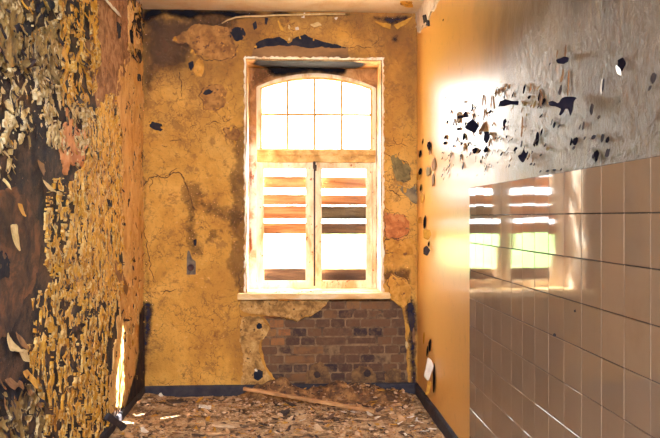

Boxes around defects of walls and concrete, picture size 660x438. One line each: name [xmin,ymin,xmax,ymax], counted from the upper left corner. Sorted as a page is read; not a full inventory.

peeling [173,23,239,62]
peeling [616,58,626,76]
peeling [391,45,577,204]
peeling [570,122,610,162]
crack [143,168,196,213]
peeling [0,0,151,438]
flaking render [383,212,431,257]
flaking render [239,274,415,385]